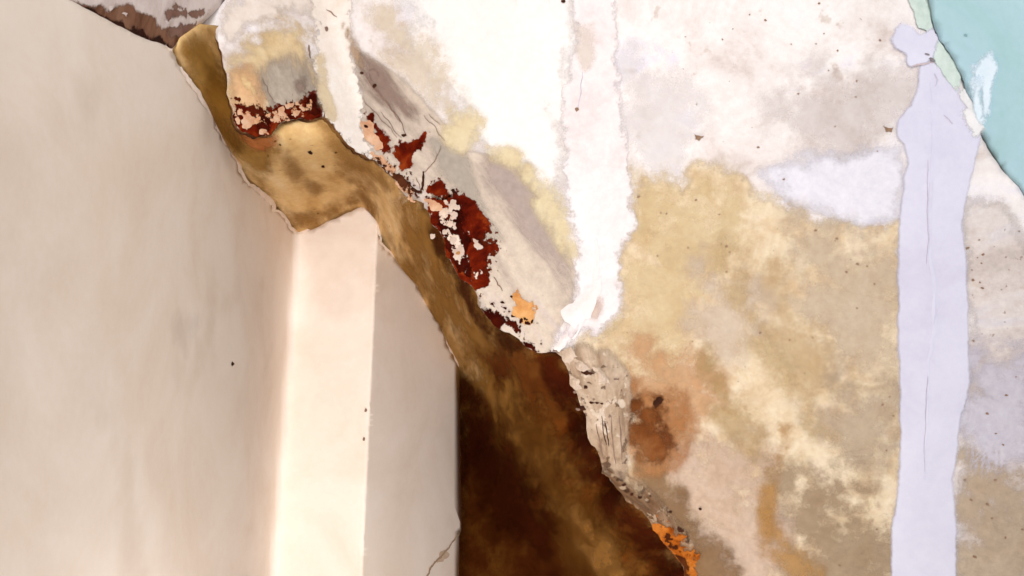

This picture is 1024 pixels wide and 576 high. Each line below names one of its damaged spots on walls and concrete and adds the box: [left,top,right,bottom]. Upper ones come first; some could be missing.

spalling [179,67,310,233]
corrosion [230,90,325,151]
water stain [181,22,388,217]
flaking render [261,56,316,120]
water stain [294,209,337,228]
corrosion [360,112,427,171]
corrosion [424,177,542,352]
flaking render [355,53,741,576]
water stain [401,160,901,576]
corrosion [651,515,702,576]